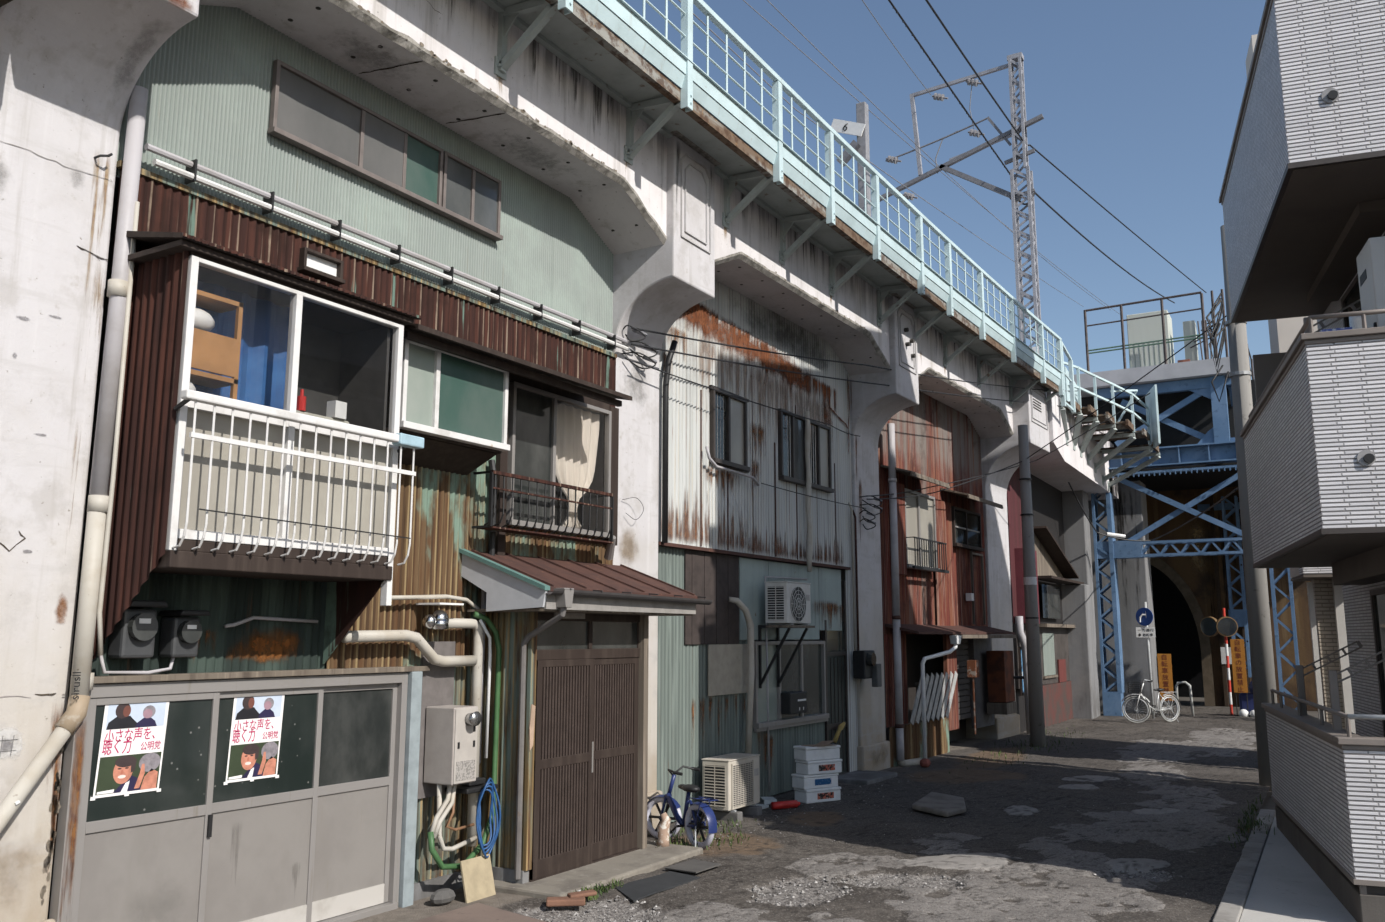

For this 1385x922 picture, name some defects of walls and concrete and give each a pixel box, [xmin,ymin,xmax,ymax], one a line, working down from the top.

damp [556,56,612,122]
crack [1,141,105,179]
rust [664,303,862,538]
rust [668,496,842,563]
rust [243,632,297,662]